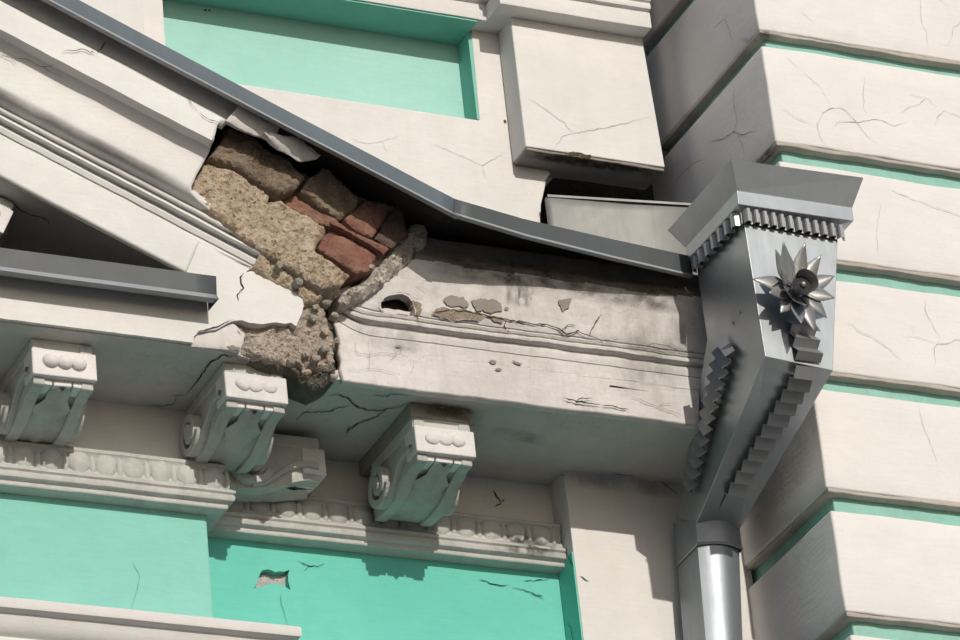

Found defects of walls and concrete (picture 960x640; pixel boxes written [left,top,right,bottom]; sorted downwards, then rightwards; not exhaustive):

crack [0,41,106,78]
crack [527,96,631,145]
crack [676,86,754,181]
crack [783,62,960,140]
spalling [189,105,428,405]
peeling [405,295,509,323]
crack [432,309,688,355]
peeling [559,298,572,311]
crack [296,341,414,434]
crack [563,397,682,416]
spalling [254,573,286,588]
crack [480,579,547,600]